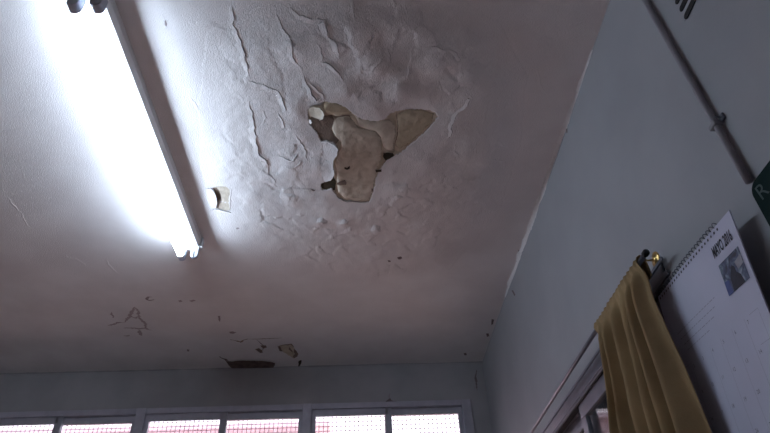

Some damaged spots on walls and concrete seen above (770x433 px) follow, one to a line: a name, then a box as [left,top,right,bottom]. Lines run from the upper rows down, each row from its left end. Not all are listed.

peeling [246,101,276,187]
peeling [276,6,438,202]
peeling [207,186,232,214]
spalling [220,340,276,368]